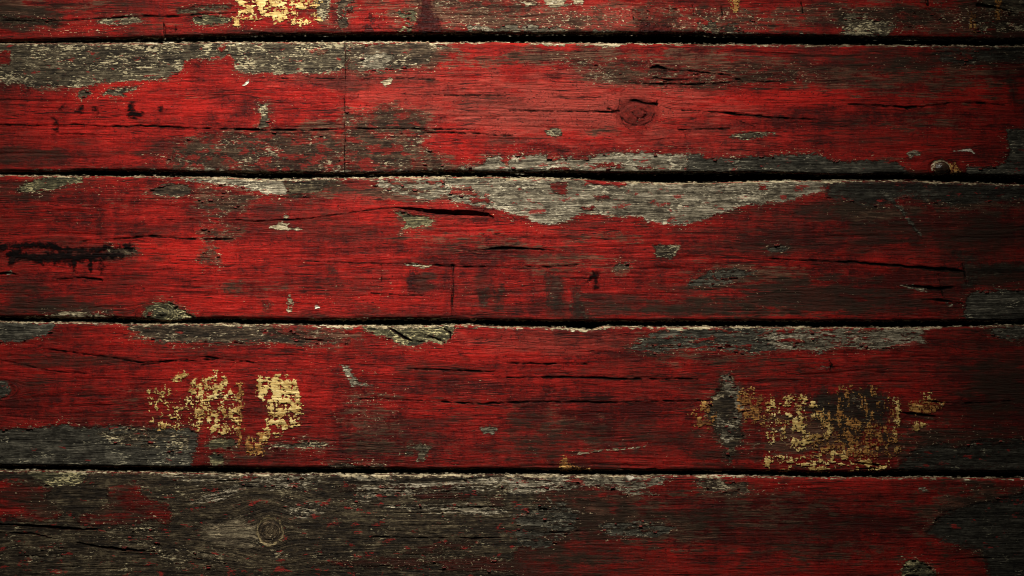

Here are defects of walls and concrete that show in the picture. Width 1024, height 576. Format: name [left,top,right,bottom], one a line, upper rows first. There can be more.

peeling [0,10,449,100]
peeling [149,104,921,230]
crack [83,207,579,341]
peeling [0,311,114,343]
peeling [128,301,348,346]
spalling [363,326,455,346]
peeling [630,327,925,370]
peeling [705,374,744,464]
peeling [854,385,898,439]
peeling [838,438,1024,473]
peeling [0,403,664,576]
peeling [696,478,751,496]